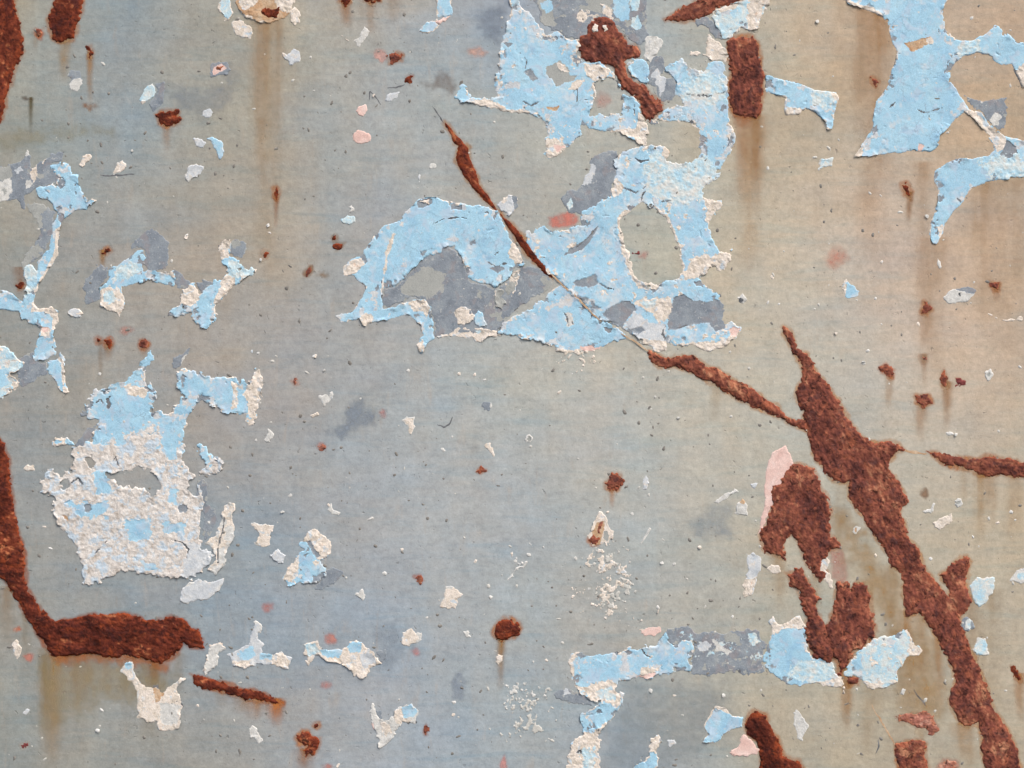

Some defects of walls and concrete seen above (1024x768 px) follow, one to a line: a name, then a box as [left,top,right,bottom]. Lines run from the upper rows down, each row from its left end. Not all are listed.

peeling [0,154,97,399]
rust [36,0,84,43]
crack [433,107,599,320]
peeling [336,0,770,356]
rust [578,17,663,123]
rust [726,34,765,119]
peeling [845,0,1024,244]
peeling [23,350,263,604]
peeling [566,632,694,768]
rust [745,711,803,768]
rust [759,462,876,686]
peeling [763,616,922,695]